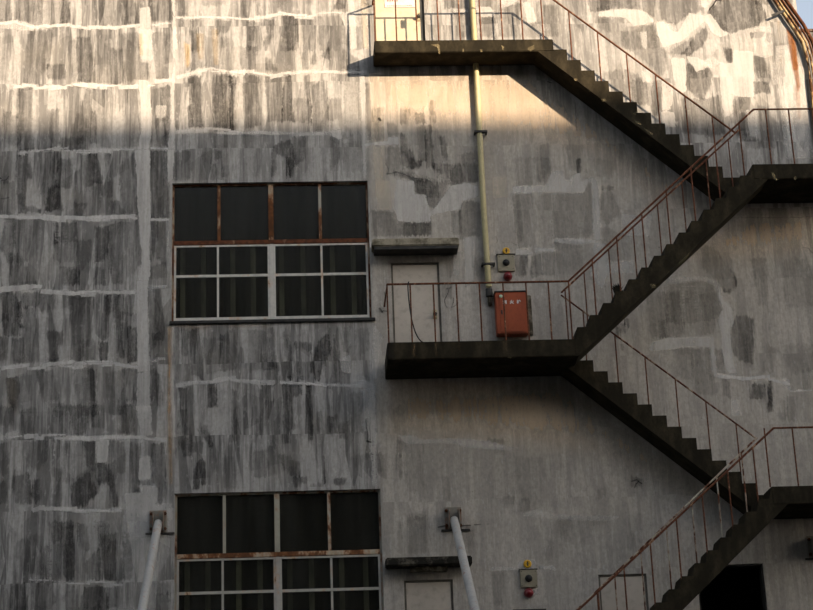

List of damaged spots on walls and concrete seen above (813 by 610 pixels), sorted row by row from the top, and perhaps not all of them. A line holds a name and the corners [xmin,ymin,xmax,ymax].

rust [788,31,799,86]
damp [282,376,313,440]
damp [193,460,206,490]